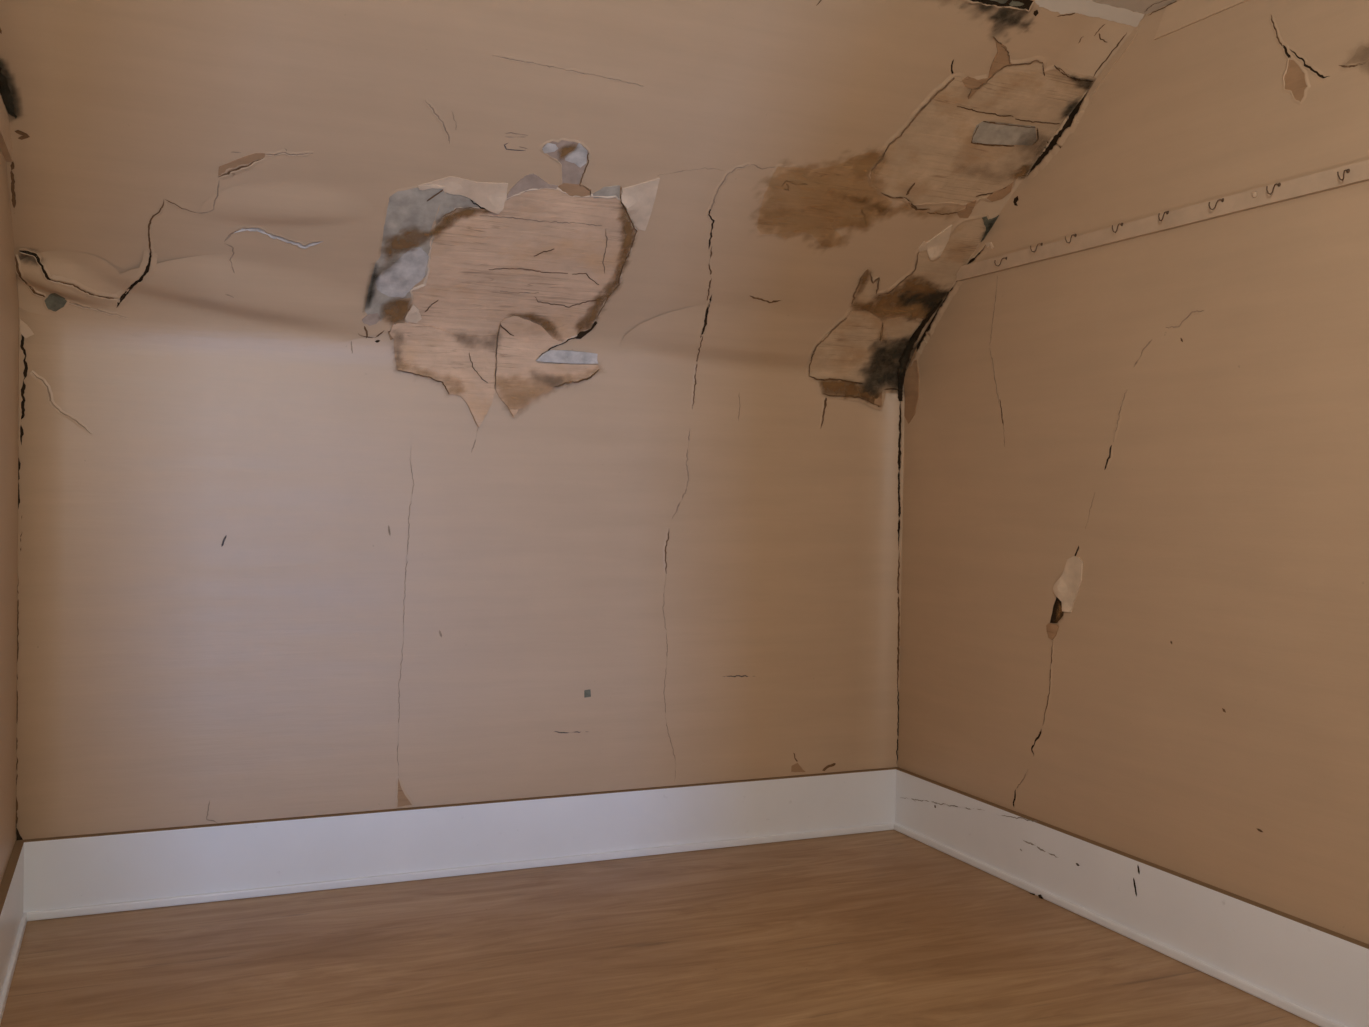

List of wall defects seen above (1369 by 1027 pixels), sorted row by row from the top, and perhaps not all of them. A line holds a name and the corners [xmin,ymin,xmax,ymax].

crack [15,149,324,785]
crack [395,452,414,809]
peeling [351,138,660,453]
crack [661,163,786,782]
peeling [805,36,1096,430]
crack [896,239,1005,760]
damp [978,0,1029,26]
crack [1012,640,1055,807]
crack [1026,89,1090,183]
crack [1074,308,1205,557]